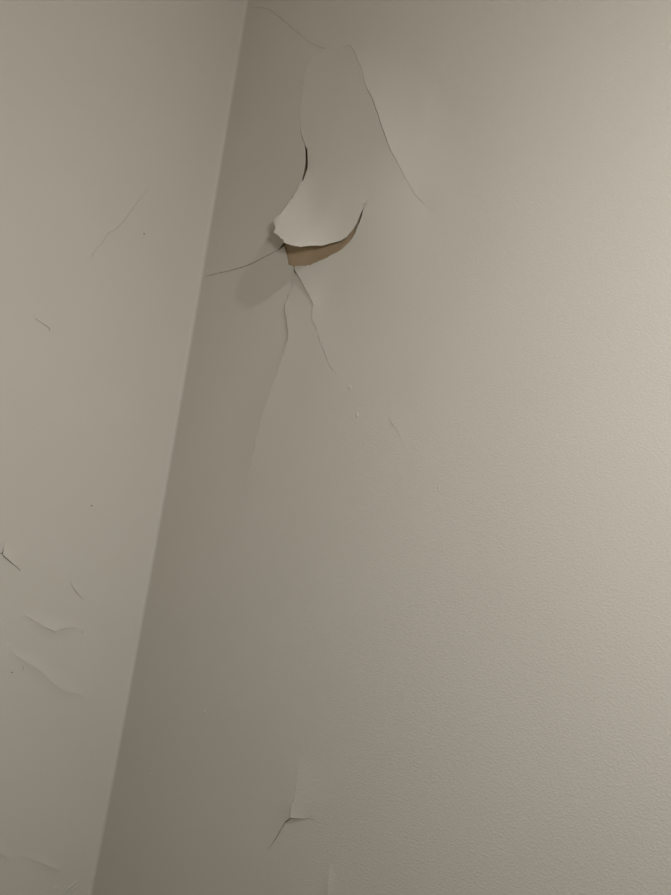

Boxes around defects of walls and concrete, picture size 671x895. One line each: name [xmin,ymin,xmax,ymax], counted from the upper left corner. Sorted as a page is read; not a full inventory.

peeling [205,8,486,535]